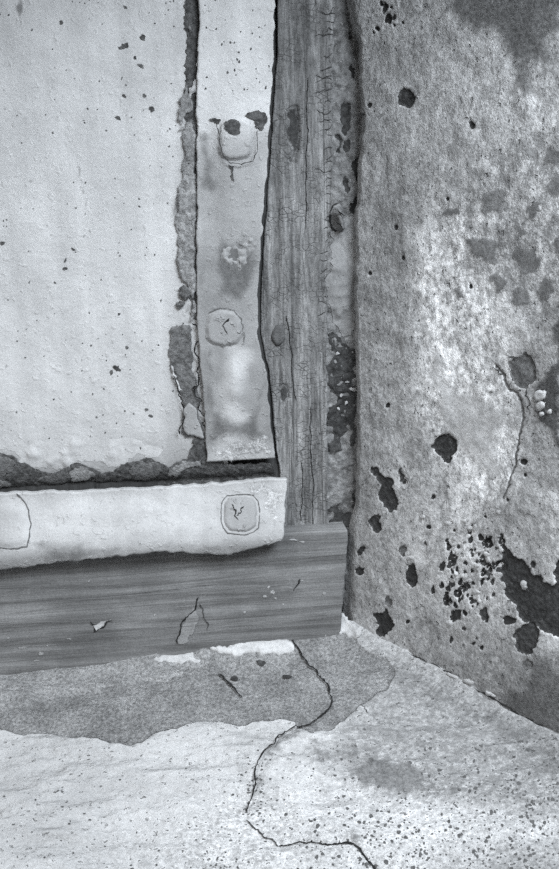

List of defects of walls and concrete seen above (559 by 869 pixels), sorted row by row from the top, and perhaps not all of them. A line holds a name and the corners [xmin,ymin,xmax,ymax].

leakage [447,0,559,92]
peeling [0,110,283,521]
peeling [326,332,357,453]
crack [493,356,530,499]
leakage [409,542,429,571]
peeling [0,596,394,745]
crack [245,640,376,869]